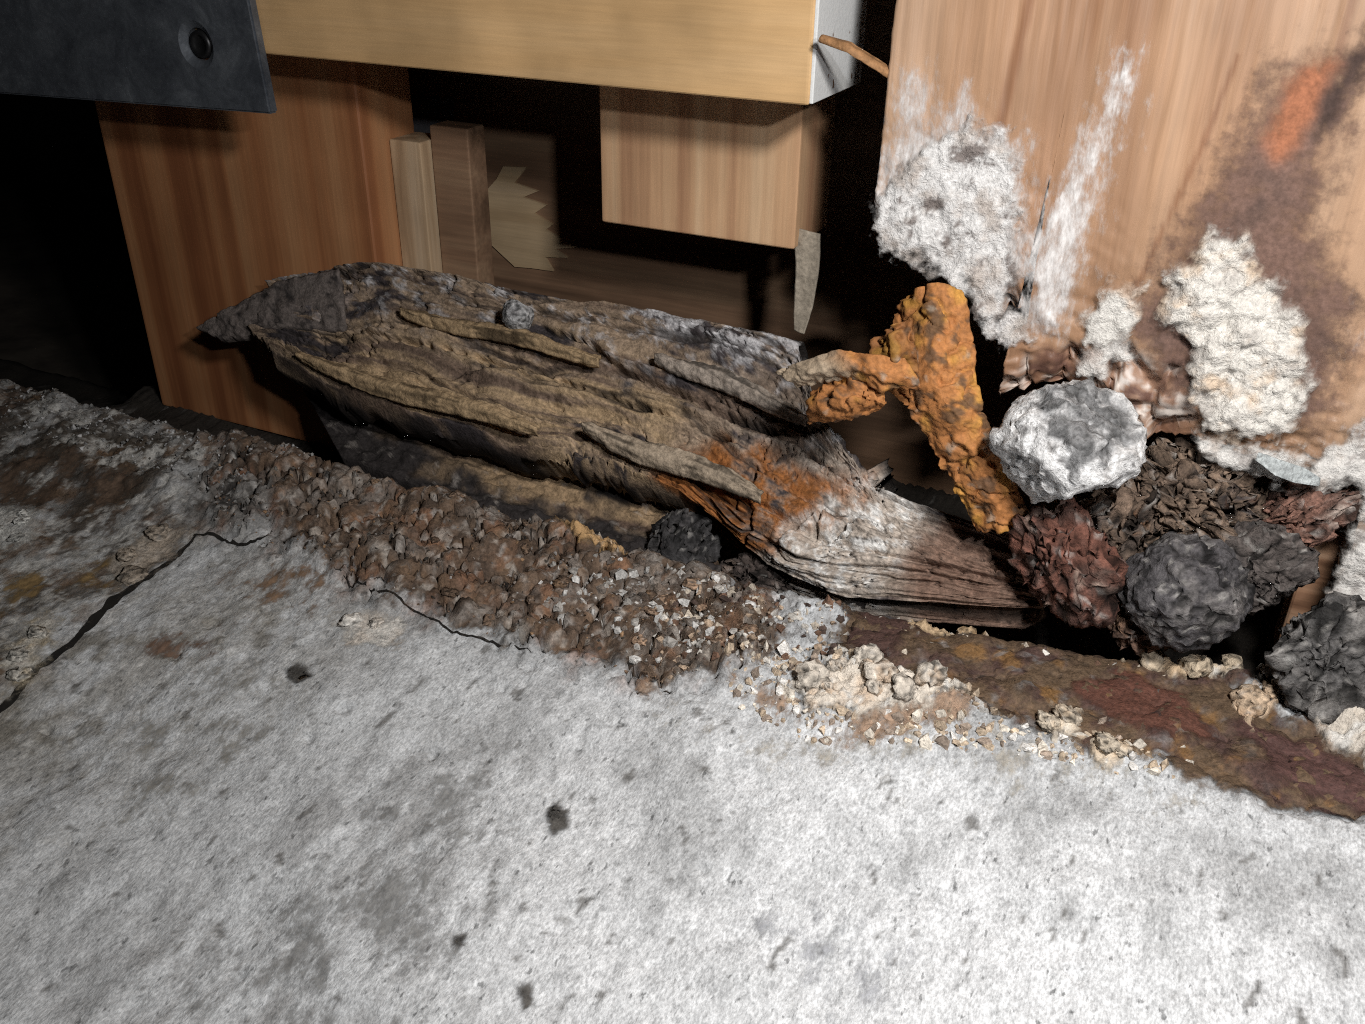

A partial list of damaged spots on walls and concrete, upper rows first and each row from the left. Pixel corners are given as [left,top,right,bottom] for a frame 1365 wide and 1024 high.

leakage [873,74,1105,346]
leakage [1076,44,1365,600]
peeling [1255,452,1321,486]
spalling [212,429,787,695]
crack [0,532,267,713]
crack [333,565,531,652]
crack [627,654,637,681]
leakage [1036,703,1133,772]
rust [832,599,1365,822]
leakage [1123,649,1279,729]
leakage [1317,706,1365,769]
spalling [546,805,569,834]